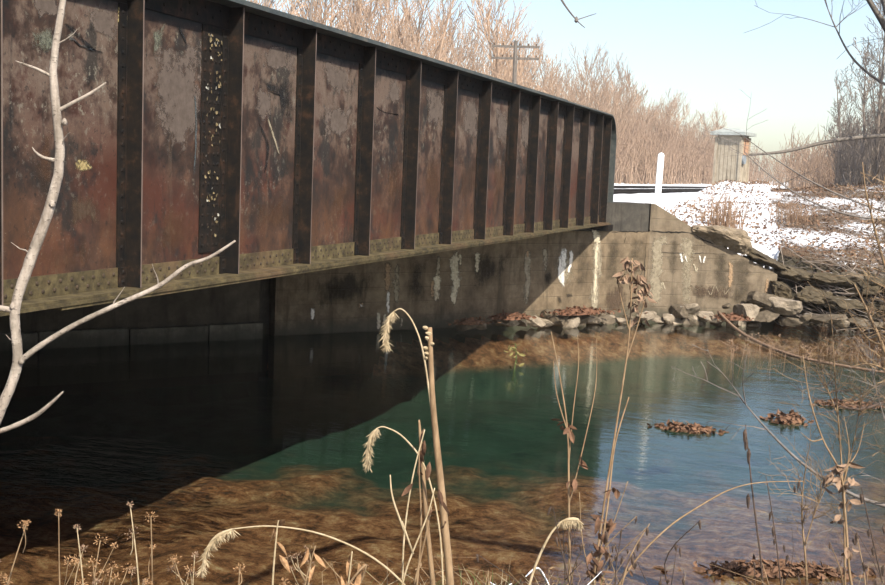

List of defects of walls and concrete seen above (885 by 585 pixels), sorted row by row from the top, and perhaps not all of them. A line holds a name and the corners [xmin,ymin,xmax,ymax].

rust [66,24,102,53]
peeling [89,9,117,40]
rust [266,82,292,121]
damp [449,252,462,304]
damp [474,253,507,286]
efflorescence [558,249,573,285]
damp [591,230,623,312]